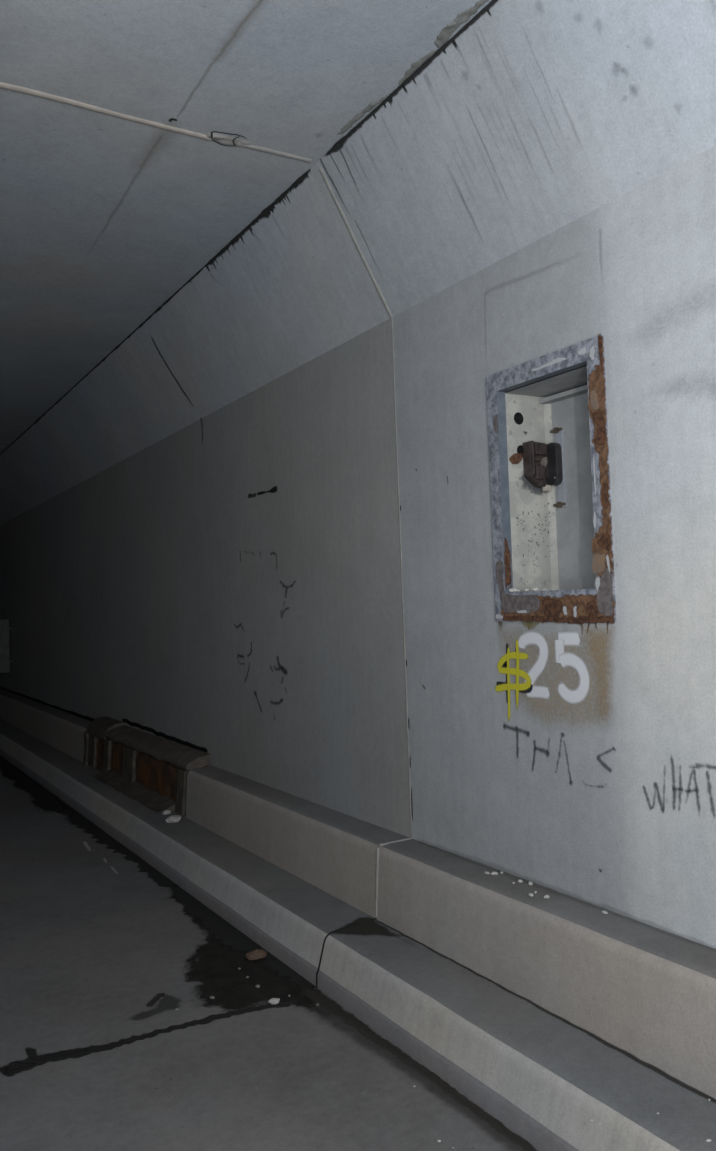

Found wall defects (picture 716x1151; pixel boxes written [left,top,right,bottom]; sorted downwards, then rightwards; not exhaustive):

water stain [0,0,498,455]
water stain [132,993,180,1020]
water stain [169,885,322,1013]